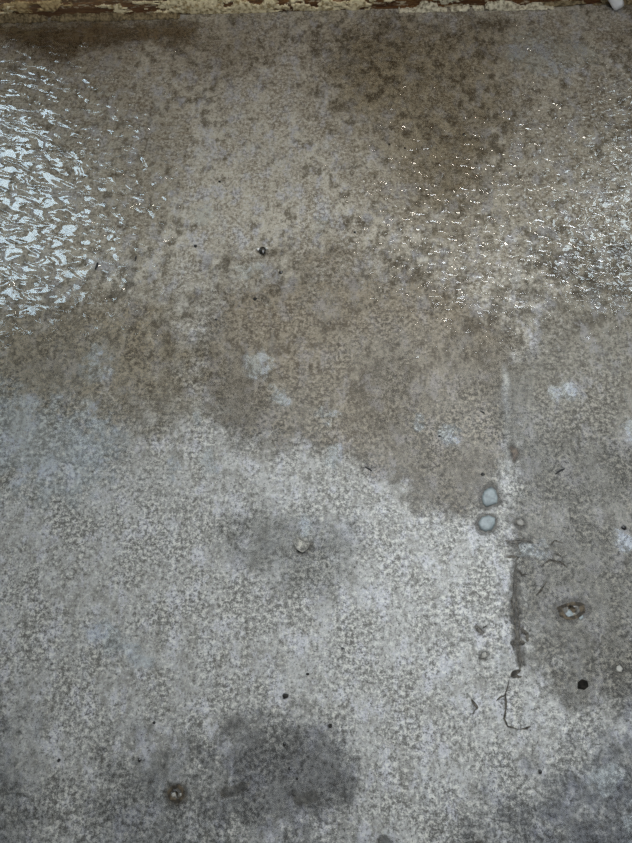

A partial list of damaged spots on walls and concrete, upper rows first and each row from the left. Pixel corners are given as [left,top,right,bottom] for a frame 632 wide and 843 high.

peeling [0,0,73,14]
water stain [0,19,197,61]
peeling [95,0,395,15]
water stain [0,235,632,707]
crack [471,538,567,730]
water stain [198,731,355,832]